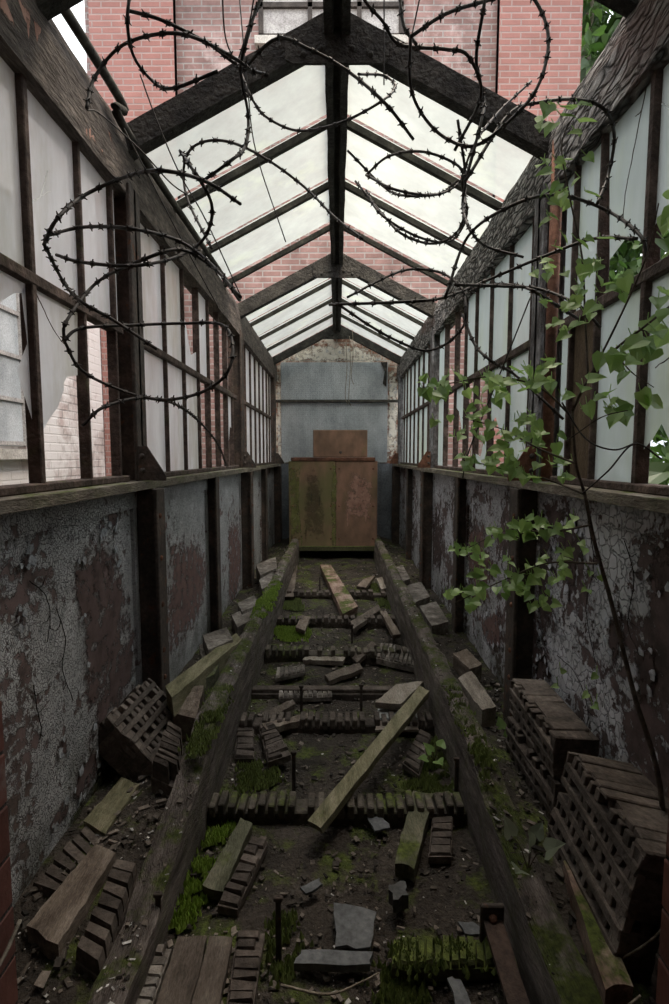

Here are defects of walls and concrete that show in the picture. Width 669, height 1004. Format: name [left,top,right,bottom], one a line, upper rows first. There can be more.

peeling [50,506,138,831]
peeling [167,535,209,655]
peeling [466,522,503,650]
peeling [532,513,584,682]
peeling [603,603,625,663]
peeling [630,647,657,704]